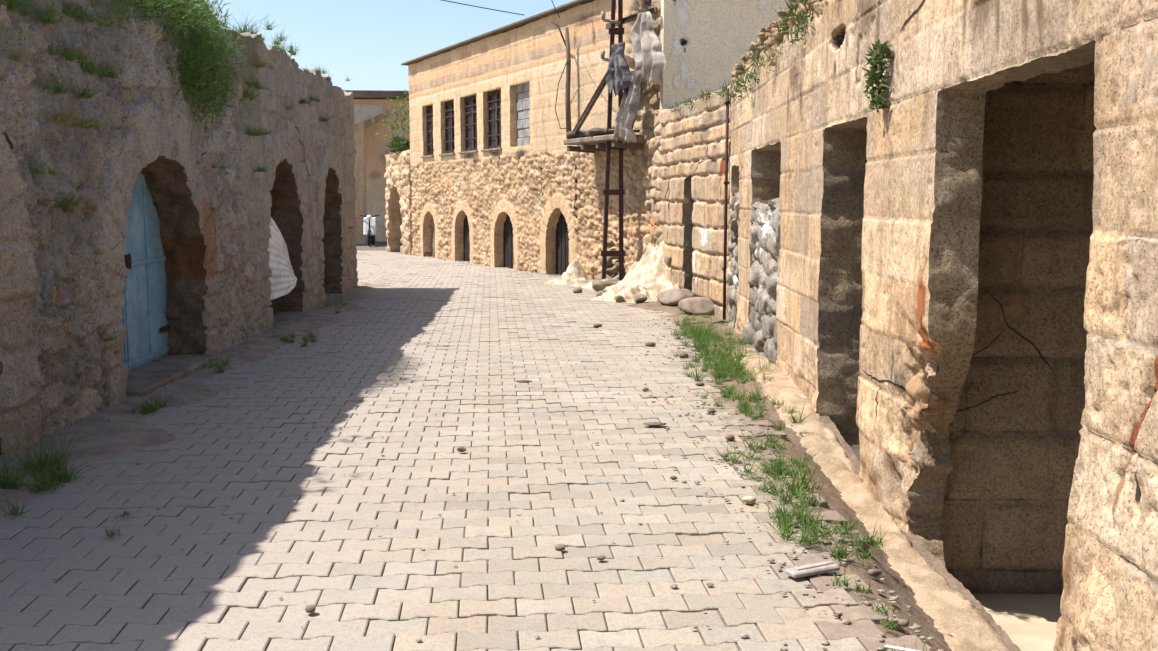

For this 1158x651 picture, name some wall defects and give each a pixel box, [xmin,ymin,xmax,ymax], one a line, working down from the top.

crack [972,287,1053,372]
crack [956,388,1026,412]
crack [1112,354,1158,515]